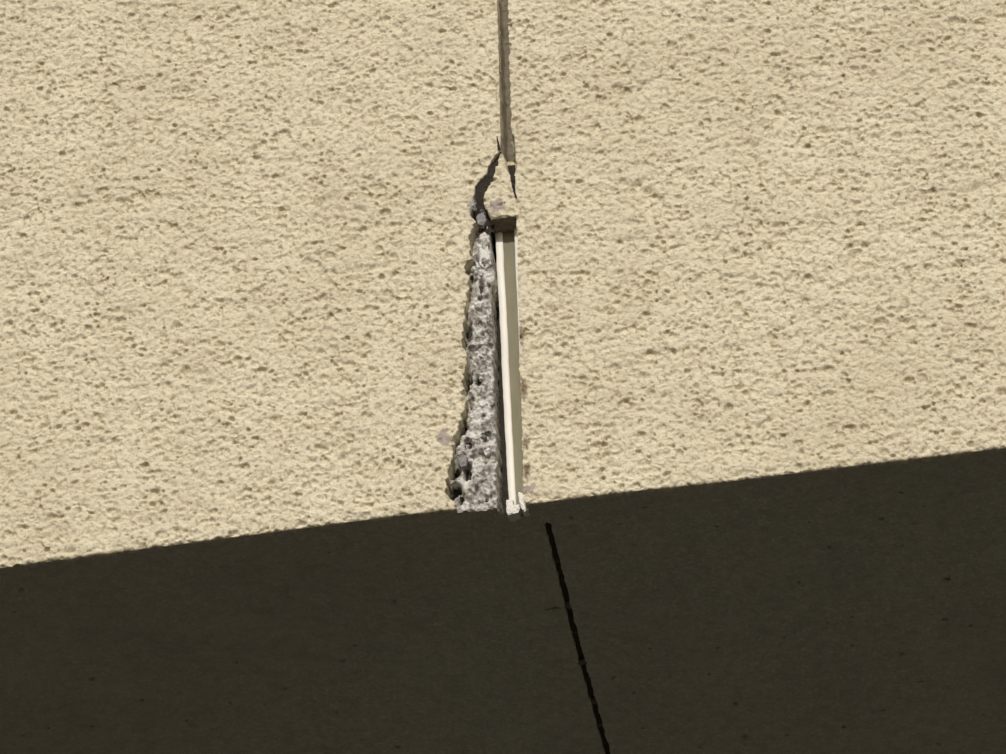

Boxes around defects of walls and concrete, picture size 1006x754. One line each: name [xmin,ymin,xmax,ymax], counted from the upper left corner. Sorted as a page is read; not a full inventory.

crack [472,136,517,275]
spalling [448,209,504,516]
crack [496,306,509,518]